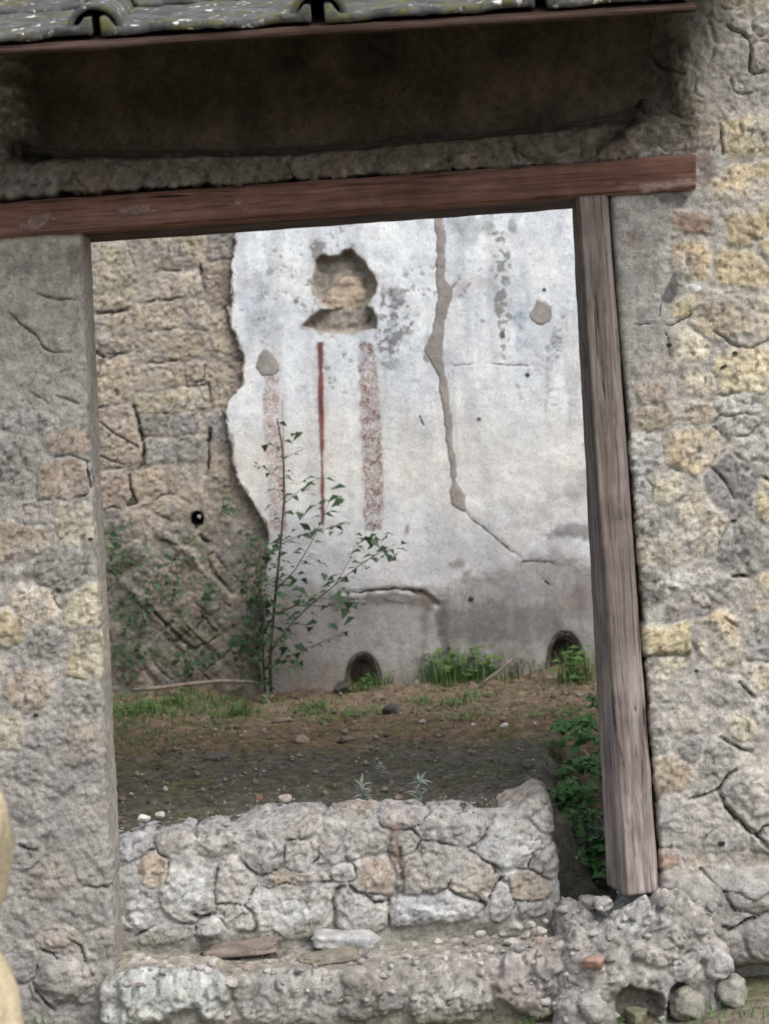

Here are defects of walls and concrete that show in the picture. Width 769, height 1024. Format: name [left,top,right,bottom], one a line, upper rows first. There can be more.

spalling [305,240,413,354]
flaking render [224,242,280,522]
crack [419,218,553,585]
crack [355,587,434,603]
crack [695,739,766,843]